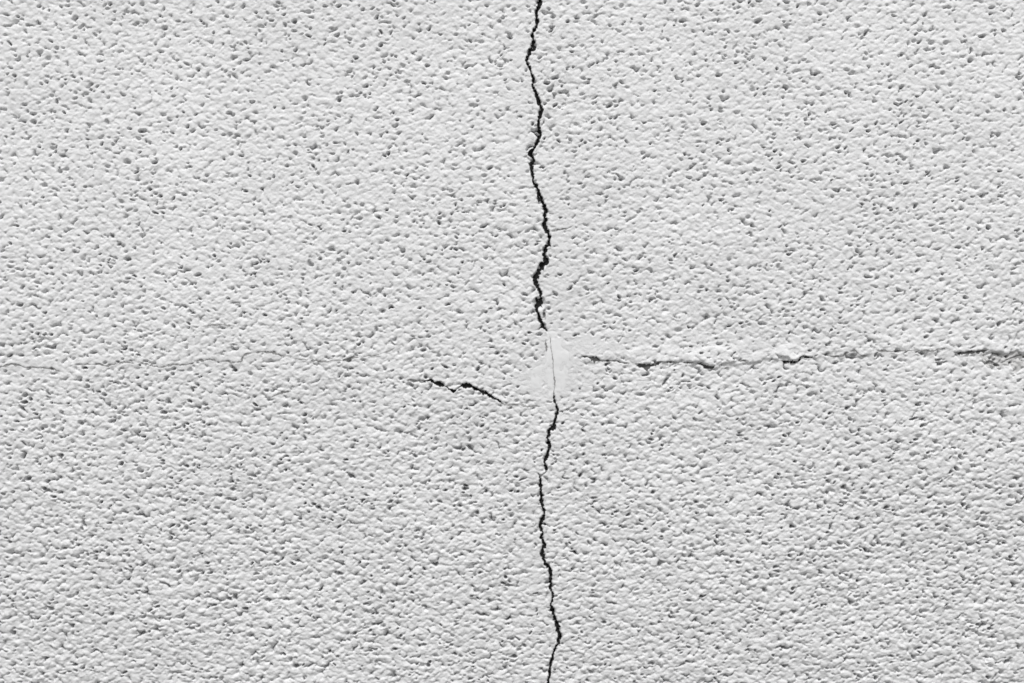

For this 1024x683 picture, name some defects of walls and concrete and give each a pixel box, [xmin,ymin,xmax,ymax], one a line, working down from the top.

crack [0,347,395,372]
crack [582,356,748,371]
crack [778,348,1024,366]